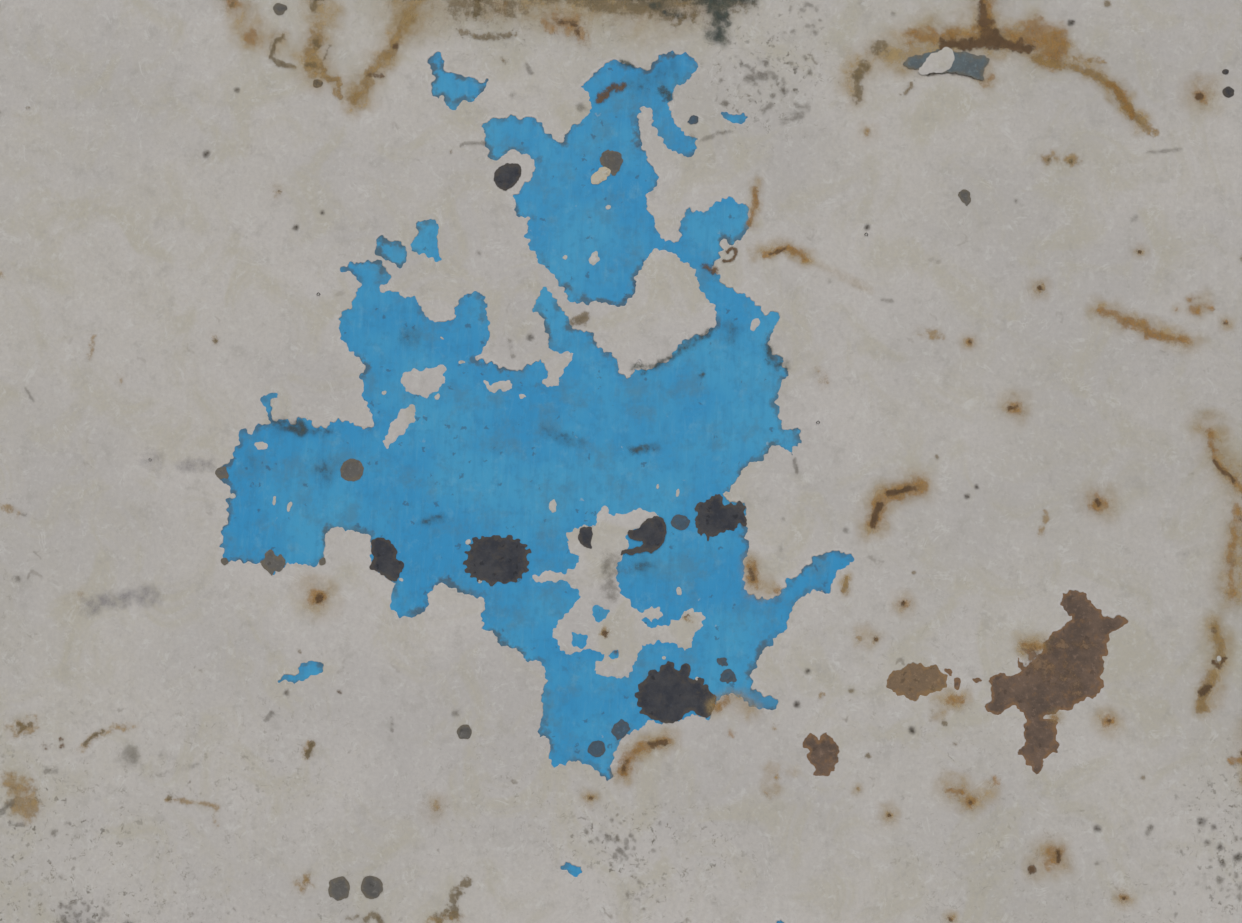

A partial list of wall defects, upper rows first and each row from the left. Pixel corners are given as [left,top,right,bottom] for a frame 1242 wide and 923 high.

rust [269,0,416,111]
rust [849,0,1158,135]
rust [1097,304,1189,344]
peeling [213,49,856,783]
rust [1208,431,1242,492]
rust [1019,639,1094,696]
rust [1196,624,1227,712]